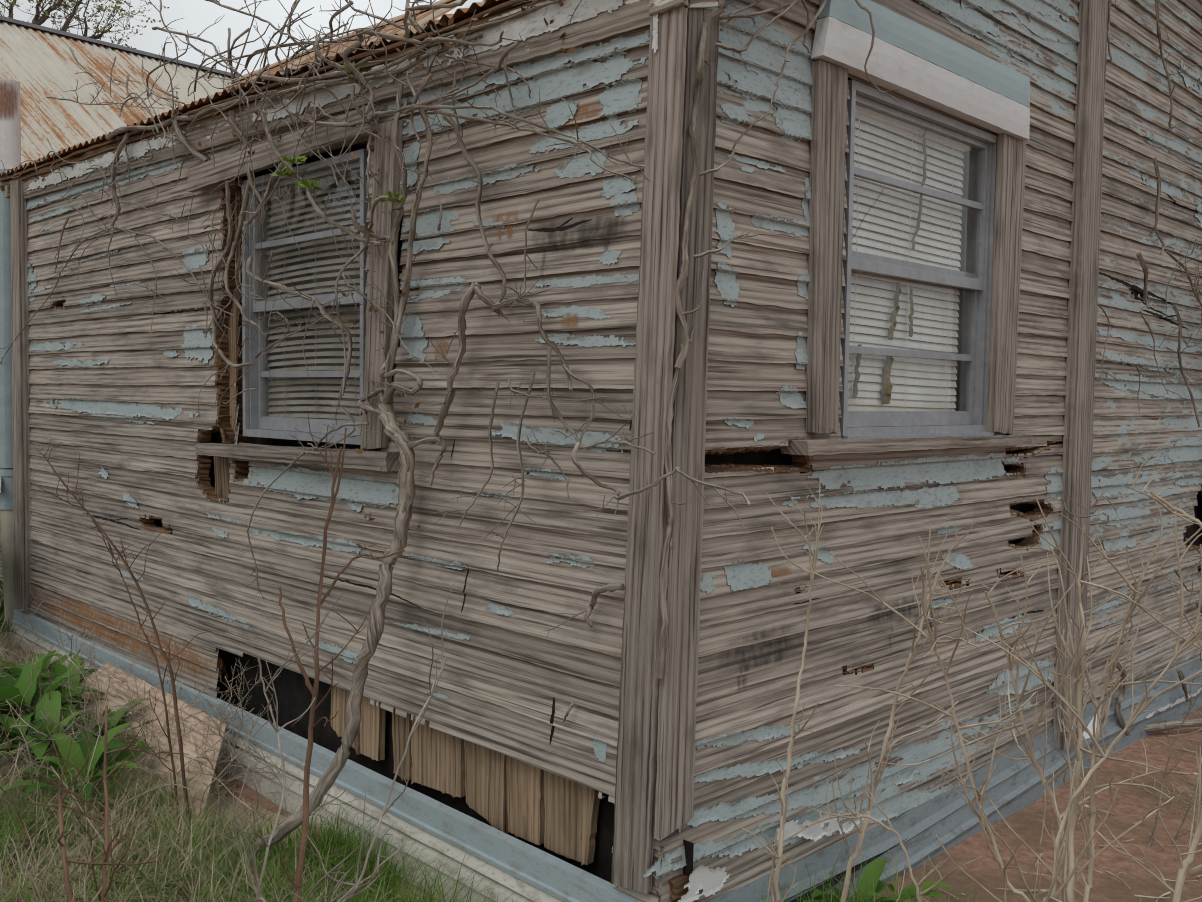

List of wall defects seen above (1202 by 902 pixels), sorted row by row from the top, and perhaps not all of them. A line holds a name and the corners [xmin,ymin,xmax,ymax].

corrosion [0,82,17,117]
peeling [250,0,623,122]
peeling [717,10,817,143]
peeling [916,0,1081,61]
peeling [26,131,189,232]
peeling [387,14,658,383]
crack [1099,272,1188,329]
peeling [1095,327,1202,403]
spalling [705,417,791,466]
peeling [243,461,399,512]
peeling [782,447,1027,509]
spalling [1184,485,1202,546]